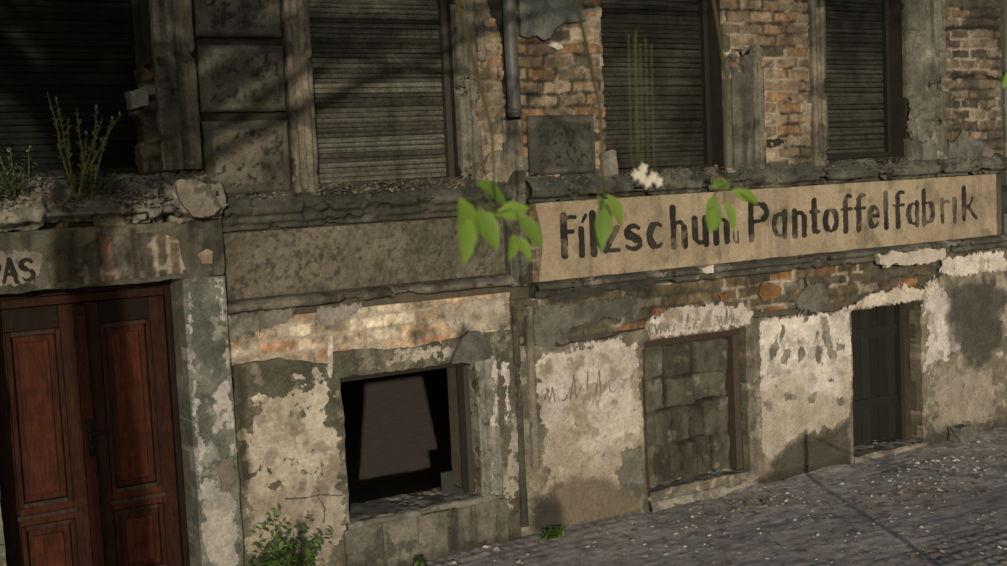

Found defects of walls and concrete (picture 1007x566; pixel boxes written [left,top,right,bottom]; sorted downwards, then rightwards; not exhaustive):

flaking render [0,232,186,287]
flaking render [529,239,540,282]
peeling [185,247,1007,566]